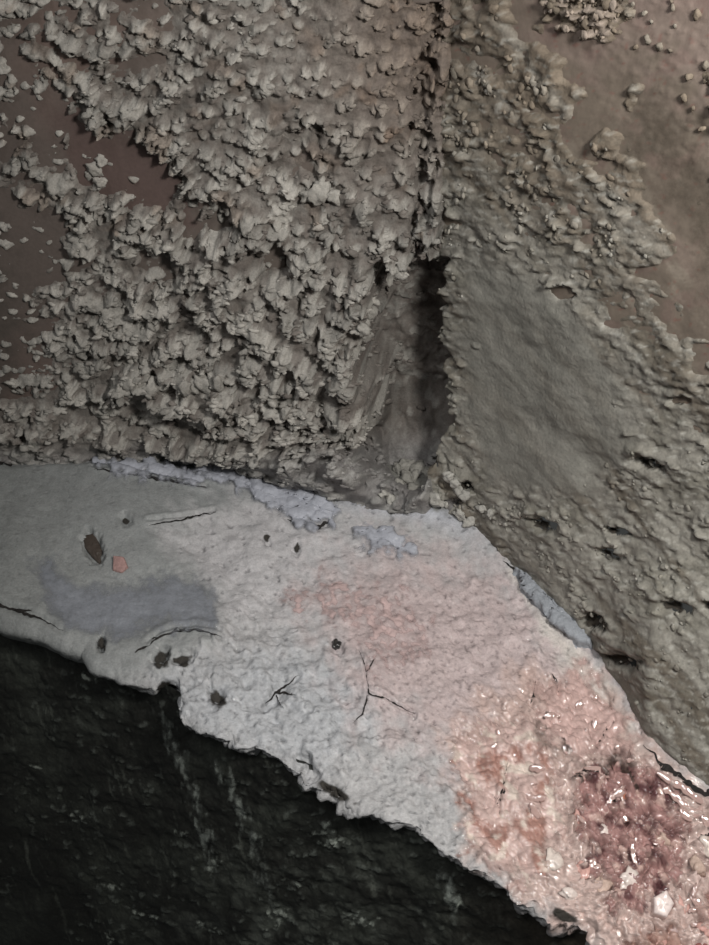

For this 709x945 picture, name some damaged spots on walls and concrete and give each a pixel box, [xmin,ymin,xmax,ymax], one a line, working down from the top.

peeling [92,456,341,532]
crack [0,603,60,630]
crack [266,675,298,707]
crack [353,653,415,723]
leakage [162,718,213,865]
leakage [215,767,251,819]
rust [450,658,692,915]
crack [644,746,709,797]
rust [624,924,684,945]